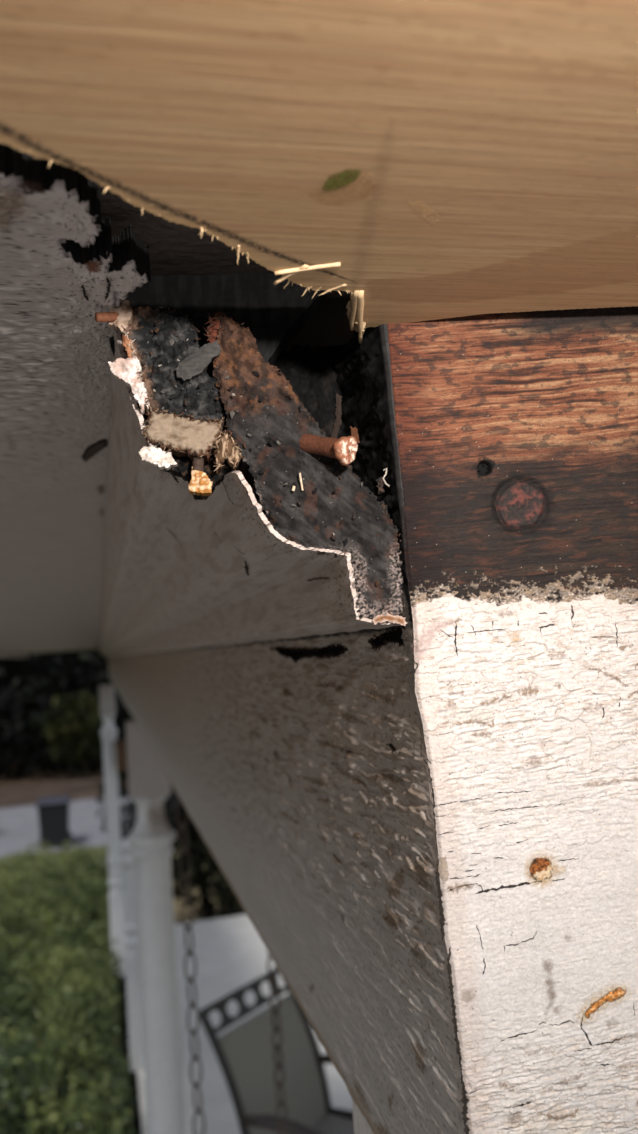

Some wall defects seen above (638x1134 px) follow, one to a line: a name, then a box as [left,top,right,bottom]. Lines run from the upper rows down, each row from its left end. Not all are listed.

peeling [108,308,151,416]
peeling [139,446,178,470]
crack [386,590,578,1134]
rust [529,858,553,882]
rust [585,988,626,1018]
crack [499,1015,621,1067]